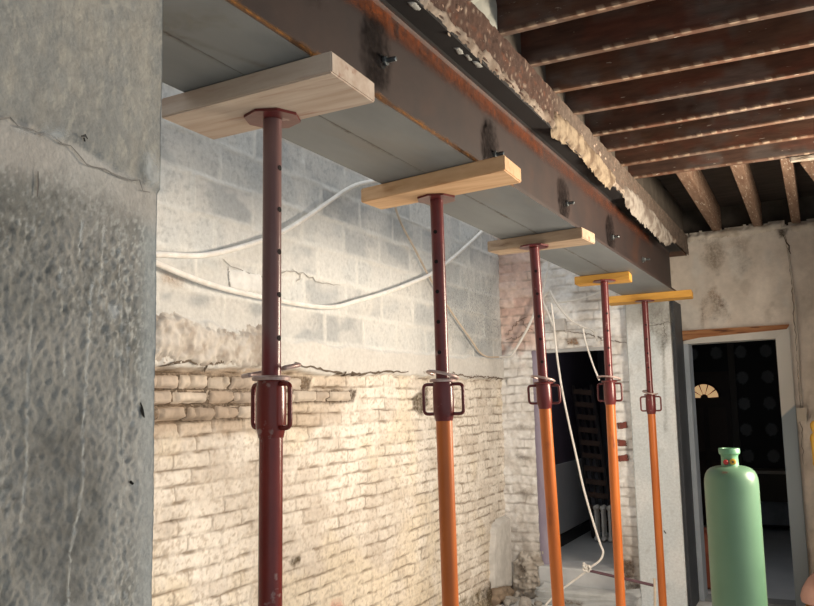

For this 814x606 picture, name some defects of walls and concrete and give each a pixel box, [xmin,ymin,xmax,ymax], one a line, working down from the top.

corrosion [359,0,542,161]
crack [0,117,157,193]
crack [779,230,804,459]
spalling [140,372,257,424]
spalling [286,376,356,404]